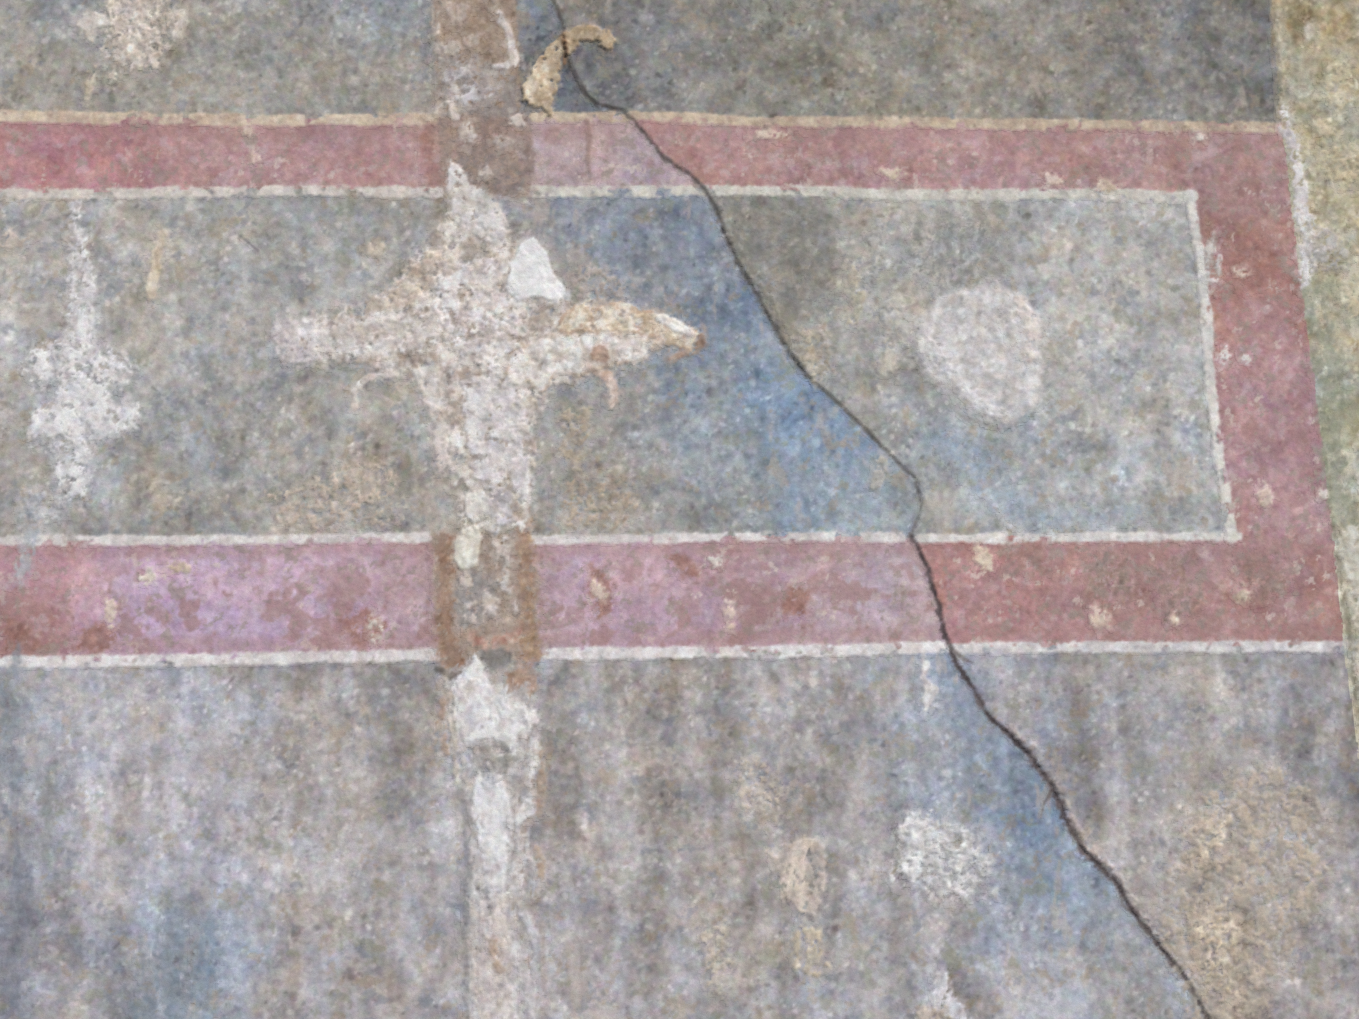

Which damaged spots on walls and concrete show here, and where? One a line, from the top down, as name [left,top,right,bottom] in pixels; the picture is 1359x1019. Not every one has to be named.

crack [238,233,260,254]
flaking render [257,0,716,577]
crack [548,0,1203,1013]